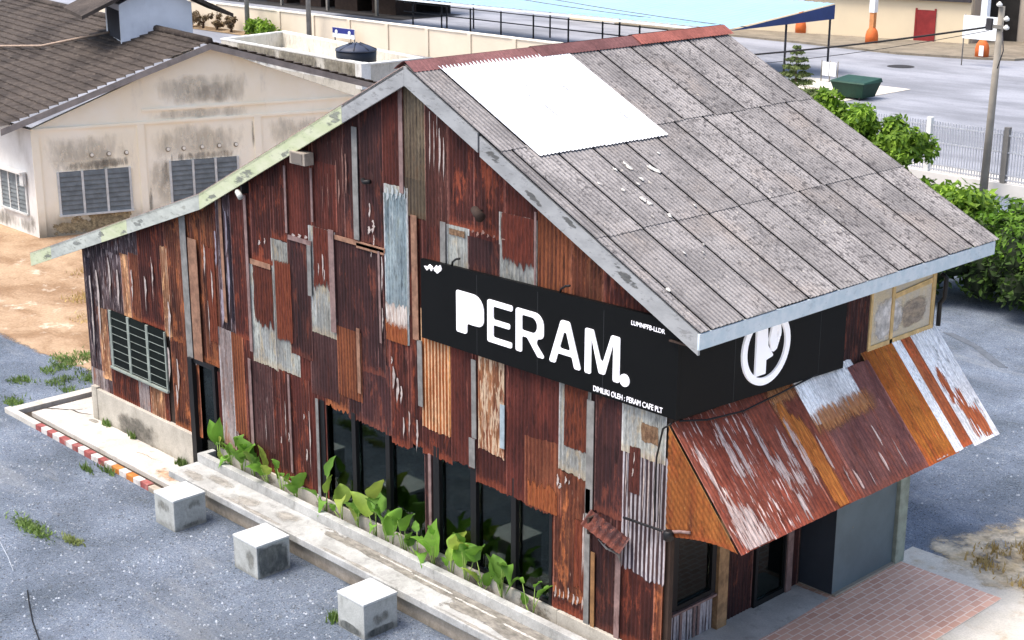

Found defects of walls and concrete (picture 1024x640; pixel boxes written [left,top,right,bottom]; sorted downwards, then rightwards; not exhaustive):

corrosion [312,226,330,291]
corrosion [205,246,219,345]
corrosion [252,260,293,344]
corrosion [386,320,408,346]
leakage [875,297,926,340]
corrosion [564,384,588,454]
corrosion [629,422,658,495]
corrosion [766,384,874,507]
corrosion [934,367,993,437]
corrosion [527,477,557,516]
corrosion [573,518,584,593]